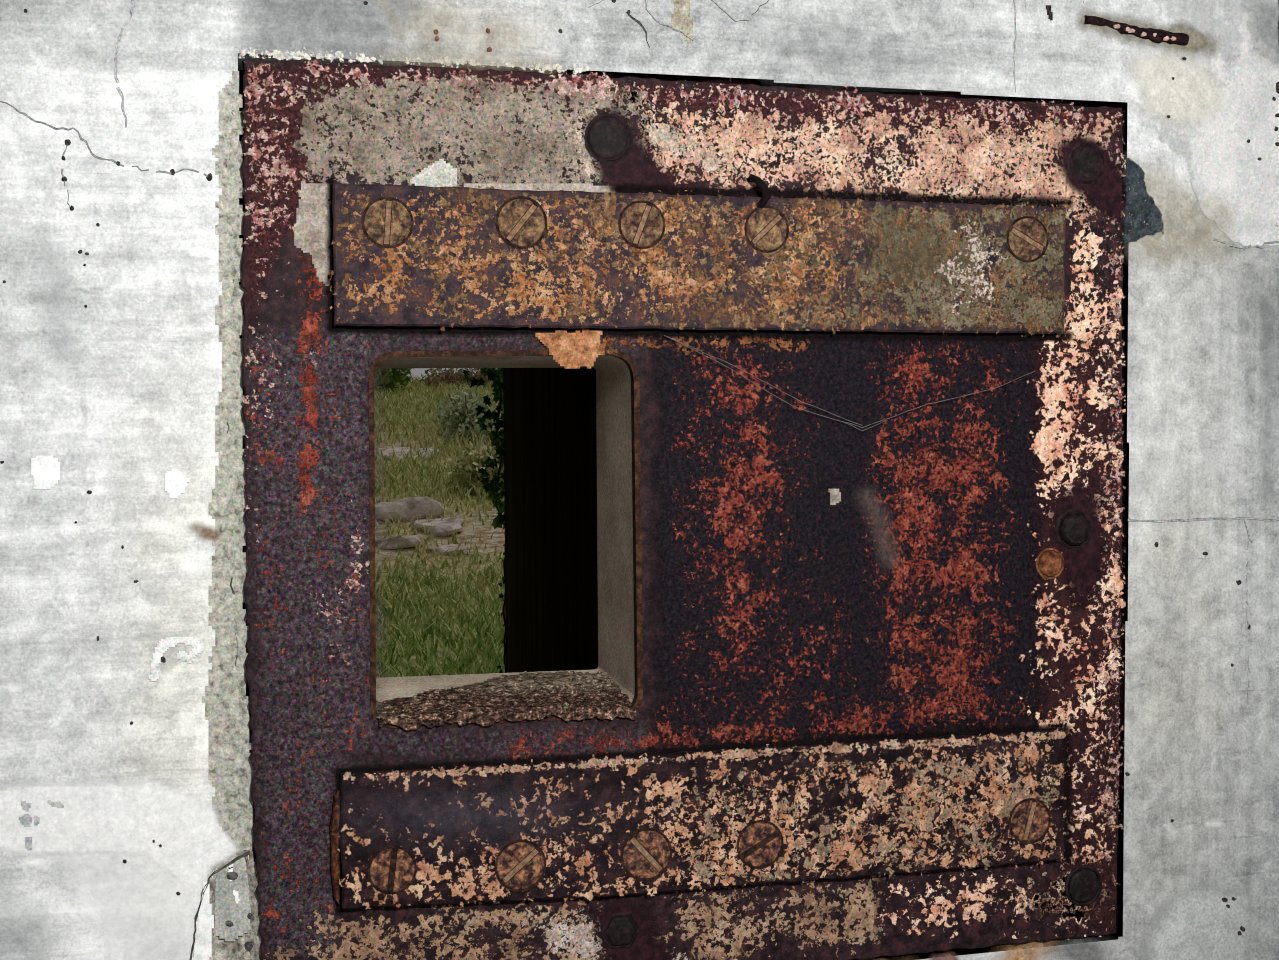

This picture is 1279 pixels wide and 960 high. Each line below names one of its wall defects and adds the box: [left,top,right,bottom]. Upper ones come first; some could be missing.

crack [0,101,213,211]
crack [114,0,135,127]
rust [1060,137,1164,245]
rust [1080,15,1214,52]
peeling [1124,0,1279,249]
peeling [293,251,340,519]
peeling [829,489,841,505]
peeling [301,499,370,624]
rust [246,198,1074,957]
crack [190,851,250,960]
peeling [305,776,640,960]
rust [1007,943,1045,960]